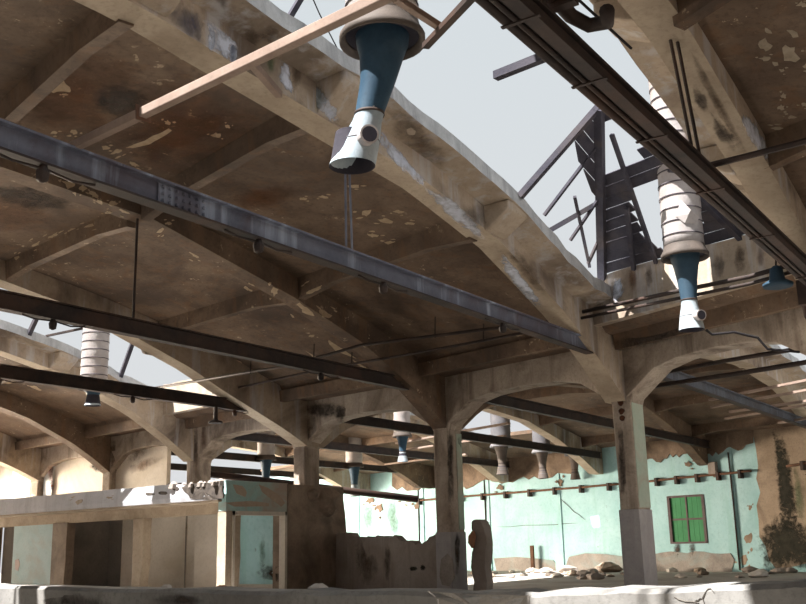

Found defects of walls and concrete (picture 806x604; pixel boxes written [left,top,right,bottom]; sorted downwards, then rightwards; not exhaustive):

peeling [755,28,806,75]
peeling [52,81,71,97]
leakage [696,90,732,141]
peeling [102,119,176,170]
leakage [742,117,768,157]
leakage [307,404,345,435]
peeling [646,440,694,469]
flaking render [656,426,806,572]
leakage [173,596,197,604]
crack [674,588,714,604]